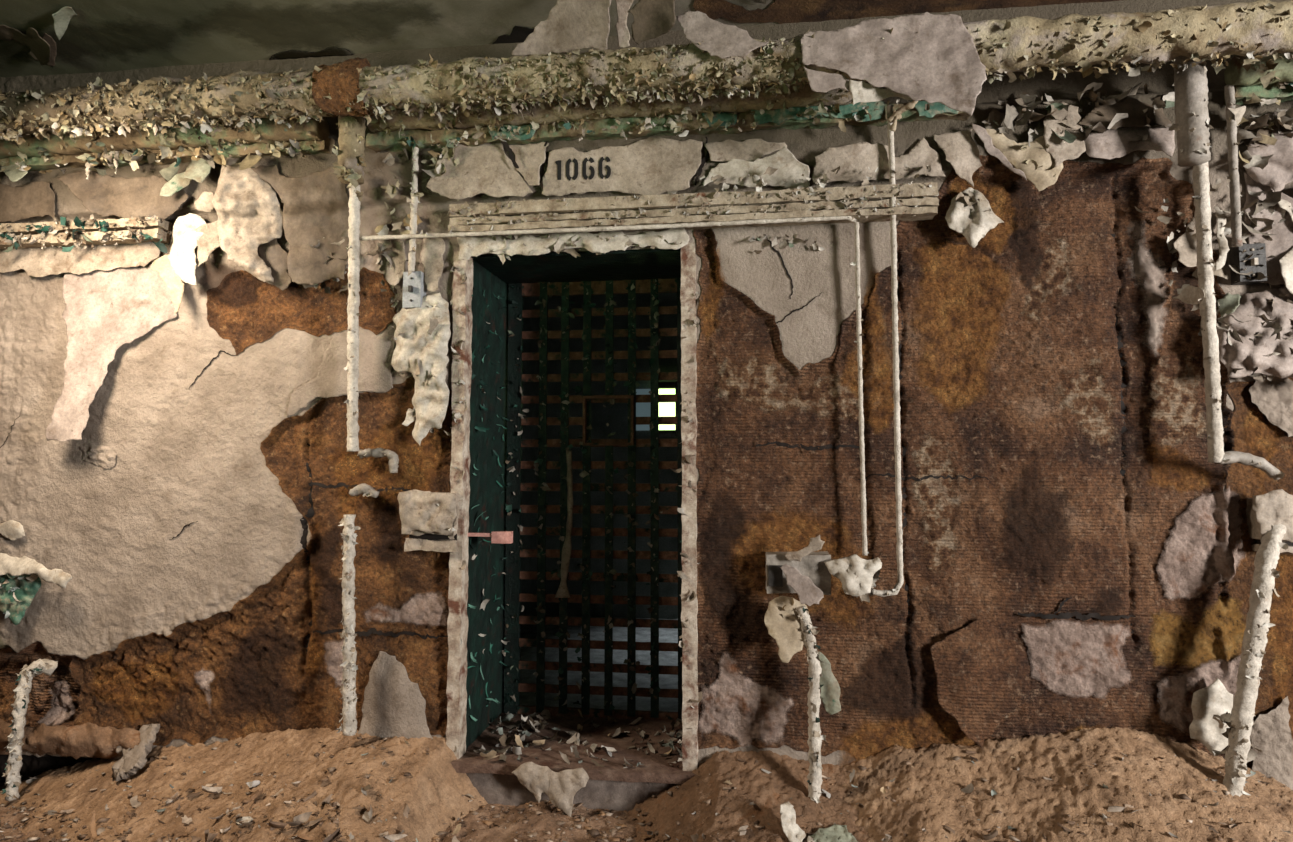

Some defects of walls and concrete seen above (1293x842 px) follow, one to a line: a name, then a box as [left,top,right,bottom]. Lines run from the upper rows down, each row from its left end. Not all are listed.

peeling [0,6,77,67]
peeling [1131,10,1188,32]
peeling [1157,23,1206,49]
peeling [1215,3,1290,35]
peeling [375,168,400,215]
peeling [749,234,825,254]
peeling [475,381,529,516]
peeling [459,505,524,577]
peeling [0,520,72,626]
peeling [467,558,593,707]
spalling [1213,623,1277,739]
peeling [512,762,589,817]